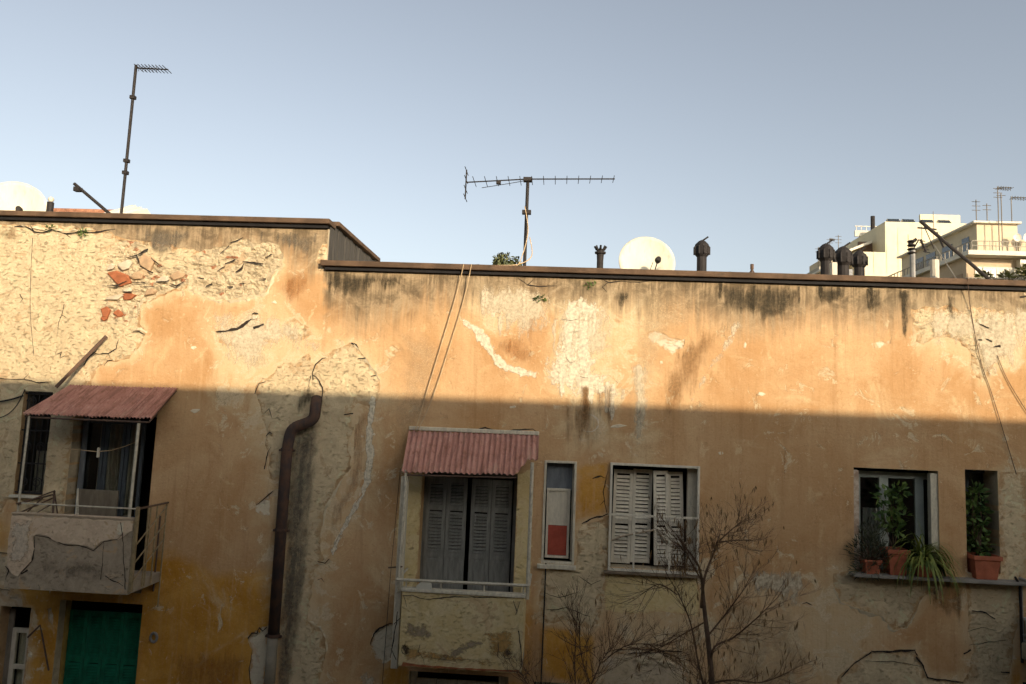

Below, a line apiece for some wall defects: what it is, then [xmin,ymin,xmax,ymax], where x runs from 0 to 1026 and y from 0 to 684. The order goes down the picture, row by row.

peeling [462,297,618,420]
leakage [719,282,800,320]
leakage [819,286,844,302]
leakage [867,287,879,308]
leakage [900,291,908,335]
peeling [911,305,1010,382]
peeling [0,224,284,684]
peeling [255,342,381,684]
crack [5,536,35,580]
crack [100,522,126,590]
peeling [833,472,1026,684]